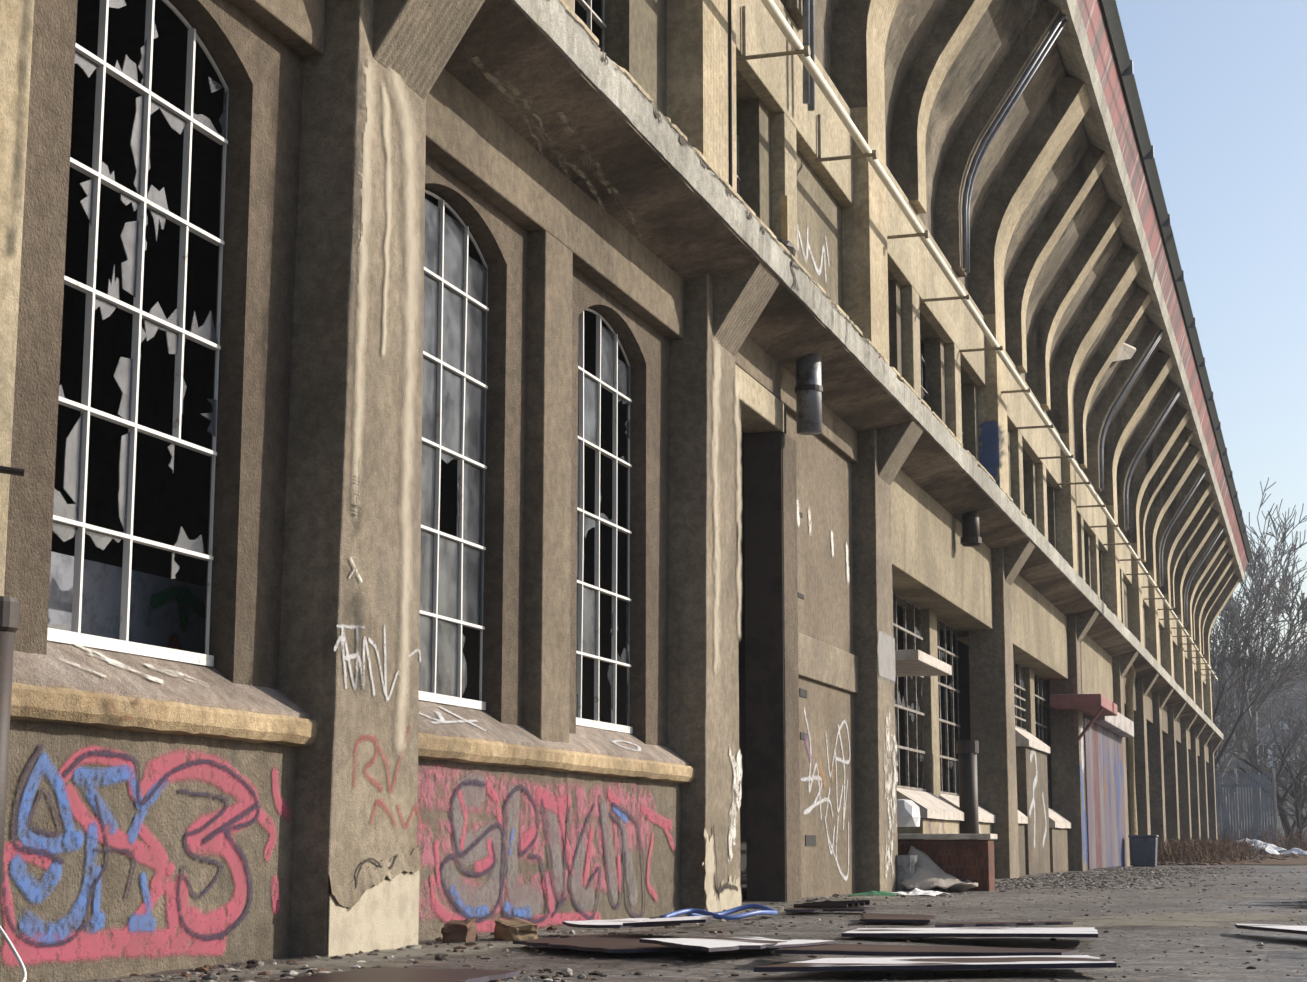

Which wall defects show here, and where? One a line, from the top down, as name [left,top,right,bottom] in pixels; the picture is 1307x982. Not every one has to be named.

damp [348,62,417,750]
spalling [328,846,422,957]
spalling [441,918,478,943]
spalling [702,749,742,913]